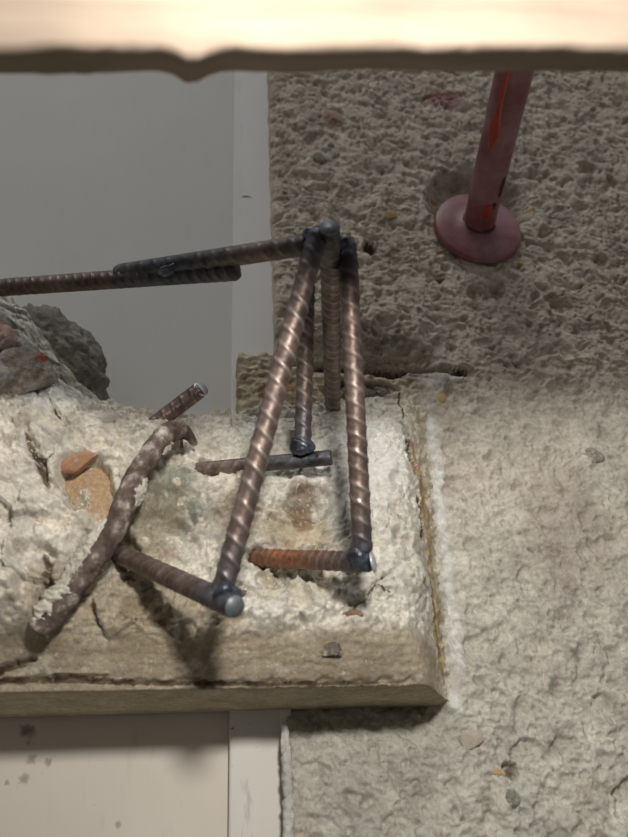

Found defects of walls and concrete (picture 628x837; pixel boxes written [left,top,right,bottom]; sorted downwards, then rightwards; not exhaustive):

spalling [0,346,58,395]
crack [372,370,406,419]
spalling [368,442,400,500]
crack [404,439,412,463]
corrosion [28,419,198,639]
corrosion [290,483,315,530]
spalling [277,519,331,551]
crack [415,496,423,538]
spalling [241,566,338,608]
crack [354,577,391,608]
spalling [322,642,343,657]
crack [0,664,377,687]